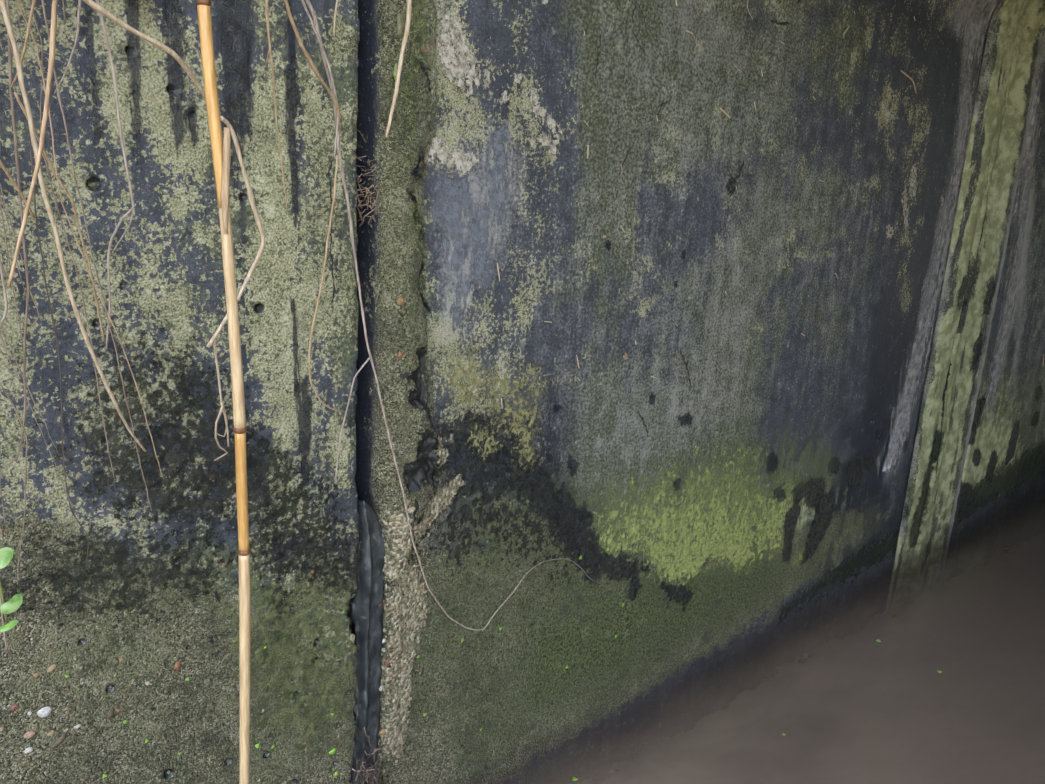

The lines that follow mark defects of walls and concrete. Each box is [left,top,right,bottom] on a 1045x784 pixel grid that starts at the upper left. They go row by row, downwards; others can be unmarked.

damp [83,2,103,150]
damp [125,0,141,164]
damp [165,0,199,149]
damp [216,0,254,176]
damp [283,22,299,228]
damp [773,0,1001,563]
damp [954,69,1045,526]
damp [0,298,361,633]
damp [412,391,650,601]
damp [660,582,693,611]
damp [678,412,693,427]
damp [779,425,944,622]